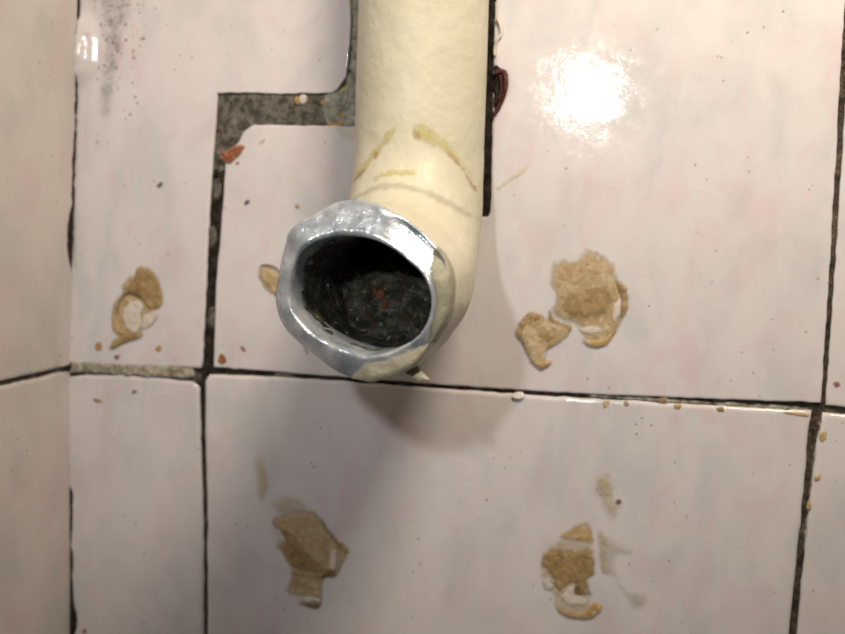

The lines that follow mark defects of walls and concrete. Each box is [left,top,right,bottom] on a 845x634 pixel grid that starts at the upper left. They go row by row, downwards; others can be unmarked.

peeling [110,267,163,349]
peeling [260,264,280,295]
peeling [516,251,628,369]
peeling [273,511,348,608]
peeling [542,524,602,619]